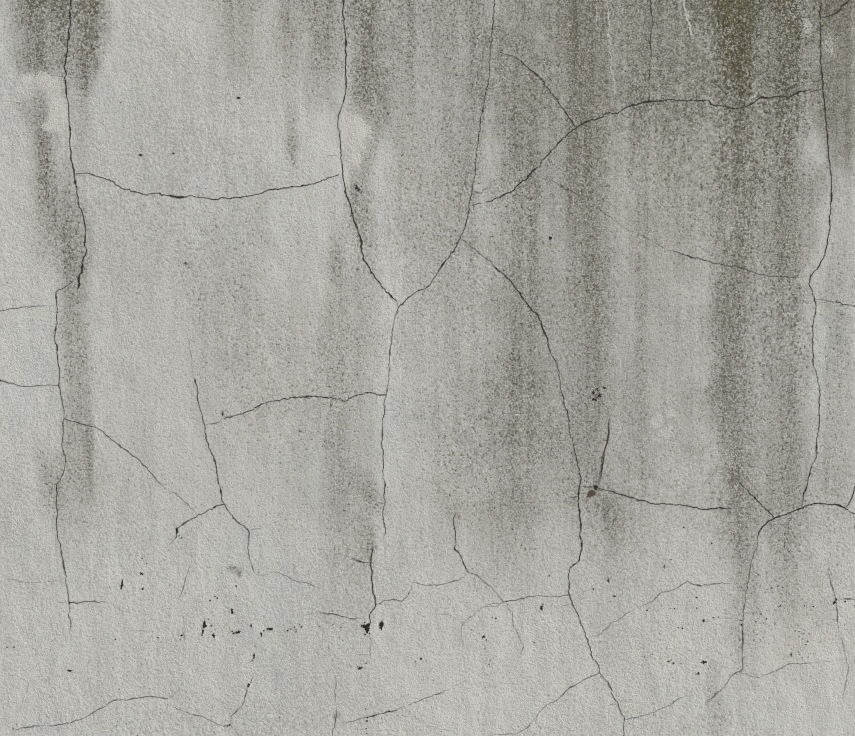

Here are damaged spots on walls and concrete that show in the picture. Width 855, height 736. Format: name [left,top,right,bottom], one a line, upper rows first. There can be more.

leakage [19,98,93,510]
leakage [12,0,105,107]
crack [0,0,495,628]
leakage [306,0,459,127]
crack [476,250,725,731]
leakage [459,0,852,588]
crack [487,0,855,589]